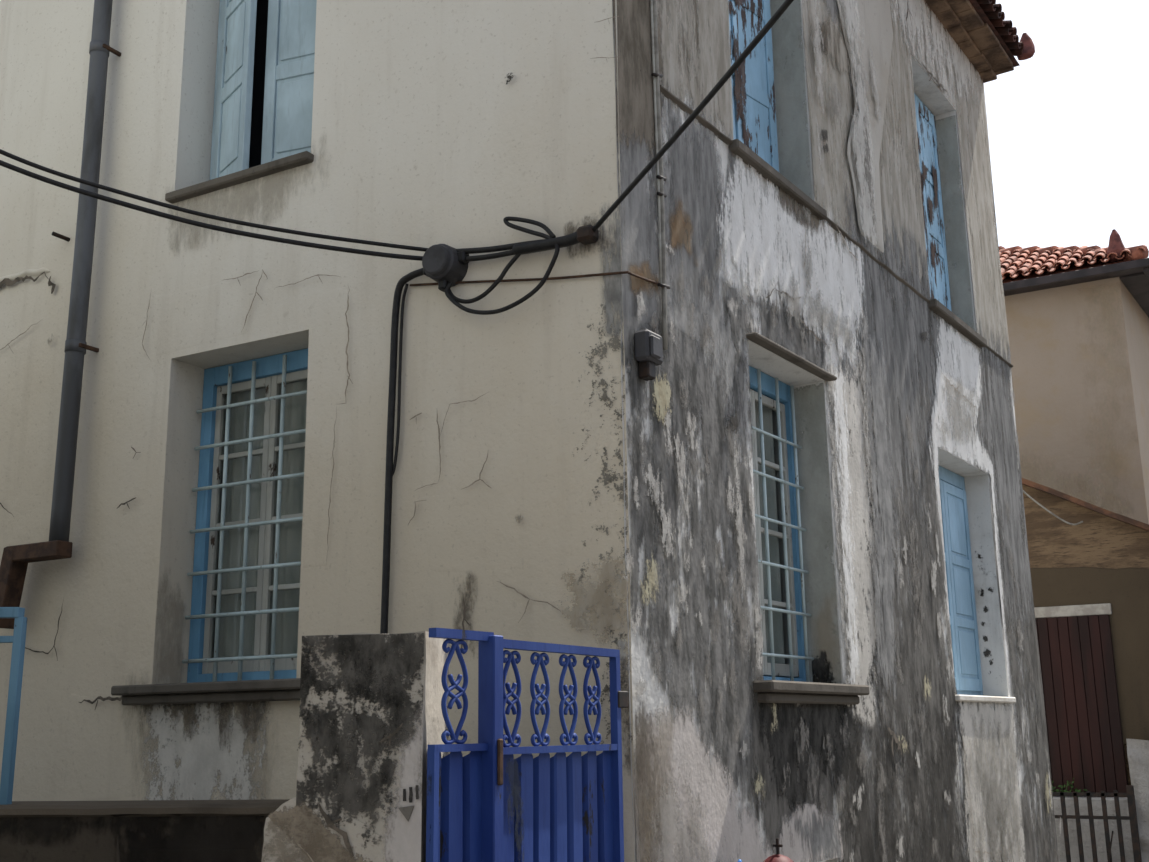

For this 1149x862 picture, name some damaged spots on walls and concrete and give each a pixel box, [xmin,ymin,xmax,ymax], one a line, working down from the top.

peeling [729,0,743,16]
peeling [734,52,752,142]
peeling [917,131,939,224]
crack [221,269,353,562]
crack [408,394,492,525]
leakage [576,0,970,862]
leakage [955,89,1062,862]
leakage [144,701,266,746]
leakage [296,633,424,845]
leakage [0,816,263,862]